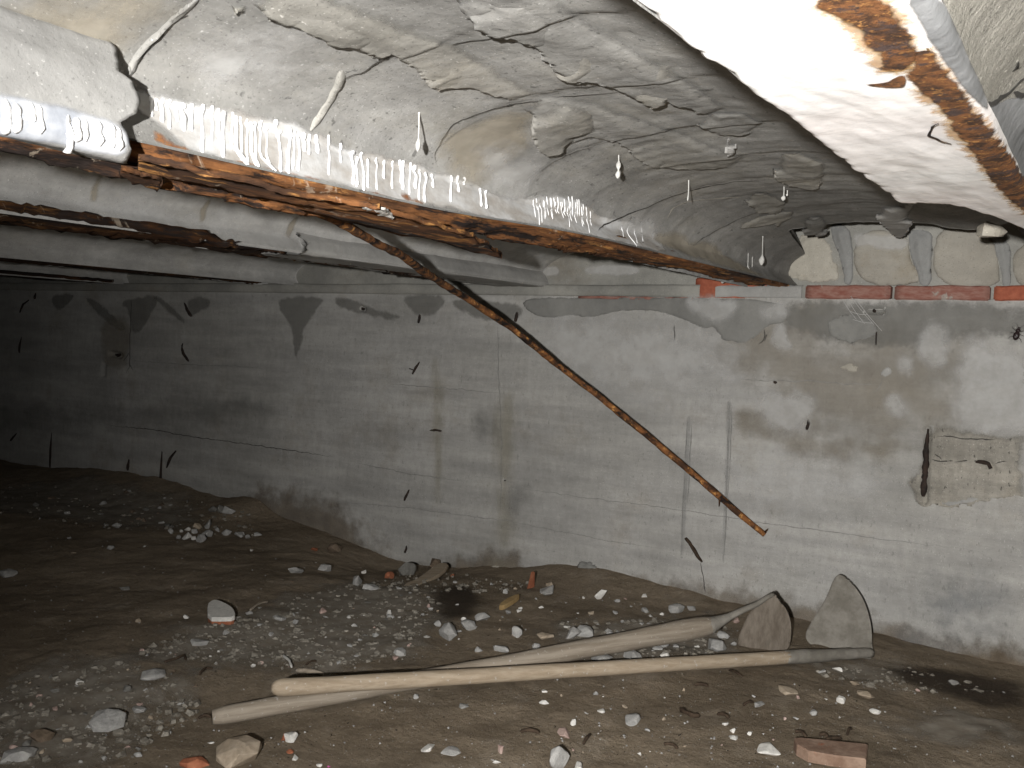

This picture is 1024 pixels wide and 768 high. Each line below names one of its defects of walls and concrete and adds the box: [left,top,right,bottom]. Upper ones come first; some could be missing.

crack [345,56,392,79]
water stain [0,95,127,155]
crack [435,92,616,152]
rust [815,0,1024,215]
water stain [137,91,757,274]
crack [599,181,755,245]
peeling [801,217,828,237]
peeling [876,203,914,238]
water stain [280,298,322,354]
rust [318,217,768,536]
rust [920,429,929,497]
spalling [909,428,1022,508]